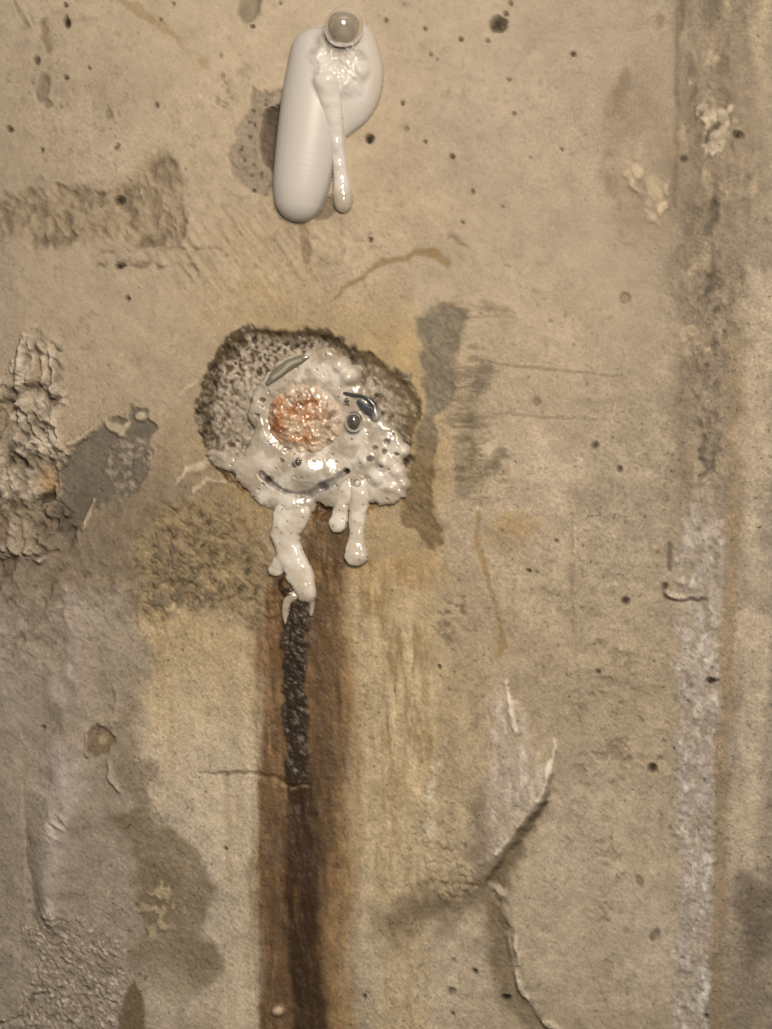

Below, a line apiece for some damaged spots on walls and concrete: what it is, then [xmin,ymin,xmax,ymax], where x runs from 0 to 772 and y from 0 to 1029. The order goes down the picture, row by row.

spalling [0,324,159,566]
damp [0,570,255,1029]
rust [244,502,372,1029]
damp [150,6,541,1029]
crack [486,879,565,1029]
damp [660,258,772,1029]